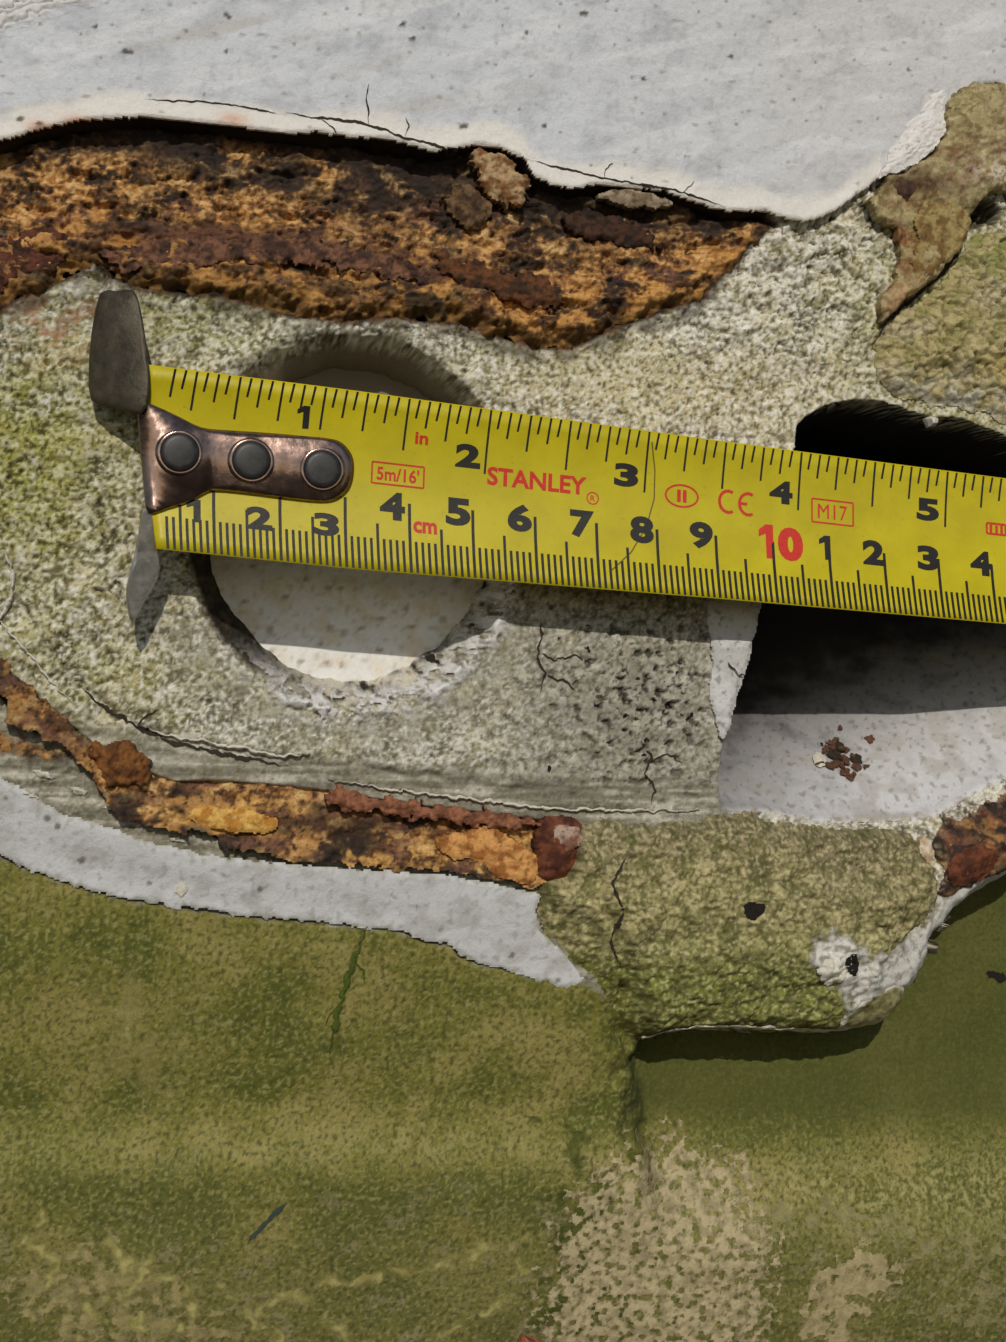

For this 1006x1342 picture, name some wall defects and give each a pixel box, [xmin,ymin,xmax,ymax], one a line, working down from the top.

rust [0,127,771,350]
spalling [865,82,1006,323]
spalling [923,416,938,428]
peeling [700,598,761,739]
peeling [33,770,89,795]
rust [0,658,582,889]
peeling [329,778,700,813]
rust [916,794,1006,897]
crack [326,927,367,1052]
spalling [744,902,765,920]
spalling [813,915,932,1029]
damp [0,1117,1006,1342]